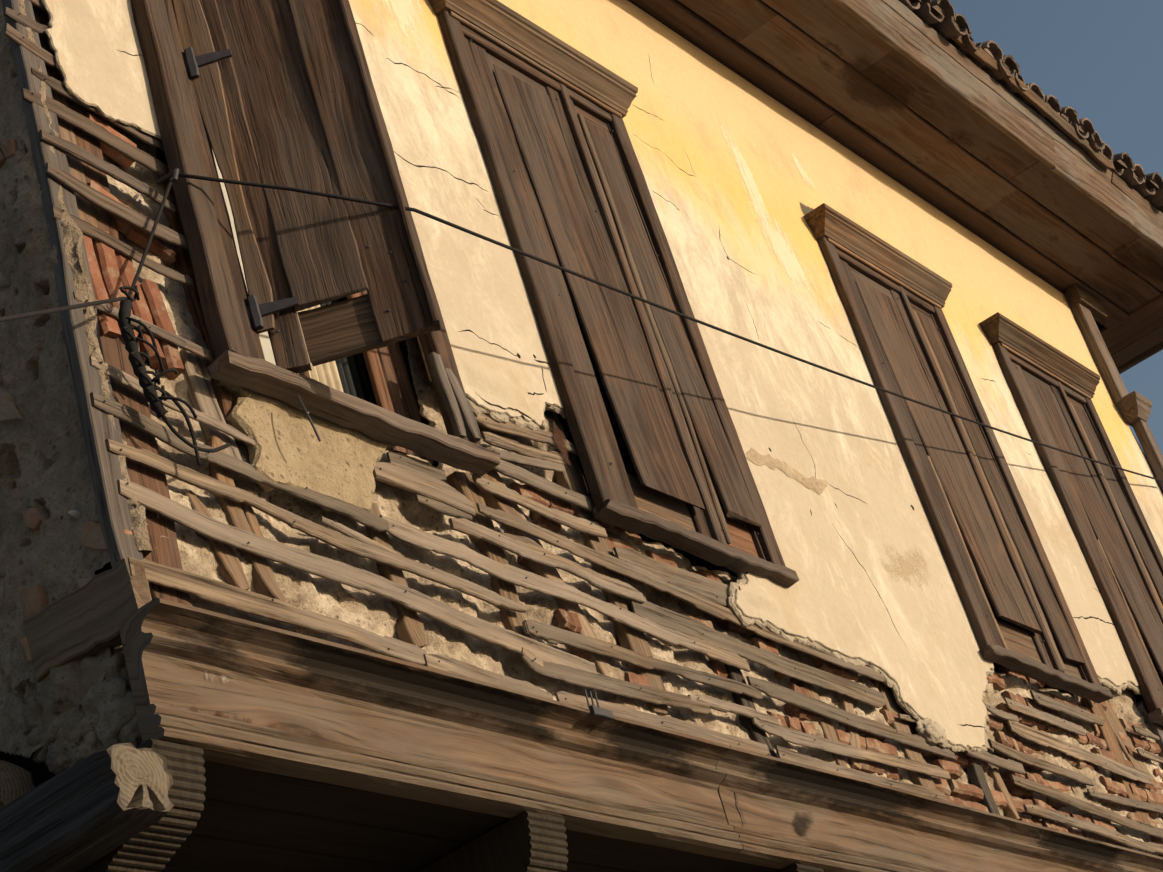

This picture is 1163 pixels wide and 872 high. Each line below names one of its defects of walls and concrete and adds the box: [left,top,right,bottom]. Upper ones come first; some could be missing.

crack [355,22,462,99]
crack [394,151,501,218]
crack [458,329,549,421]
crack [745,430,907,648]